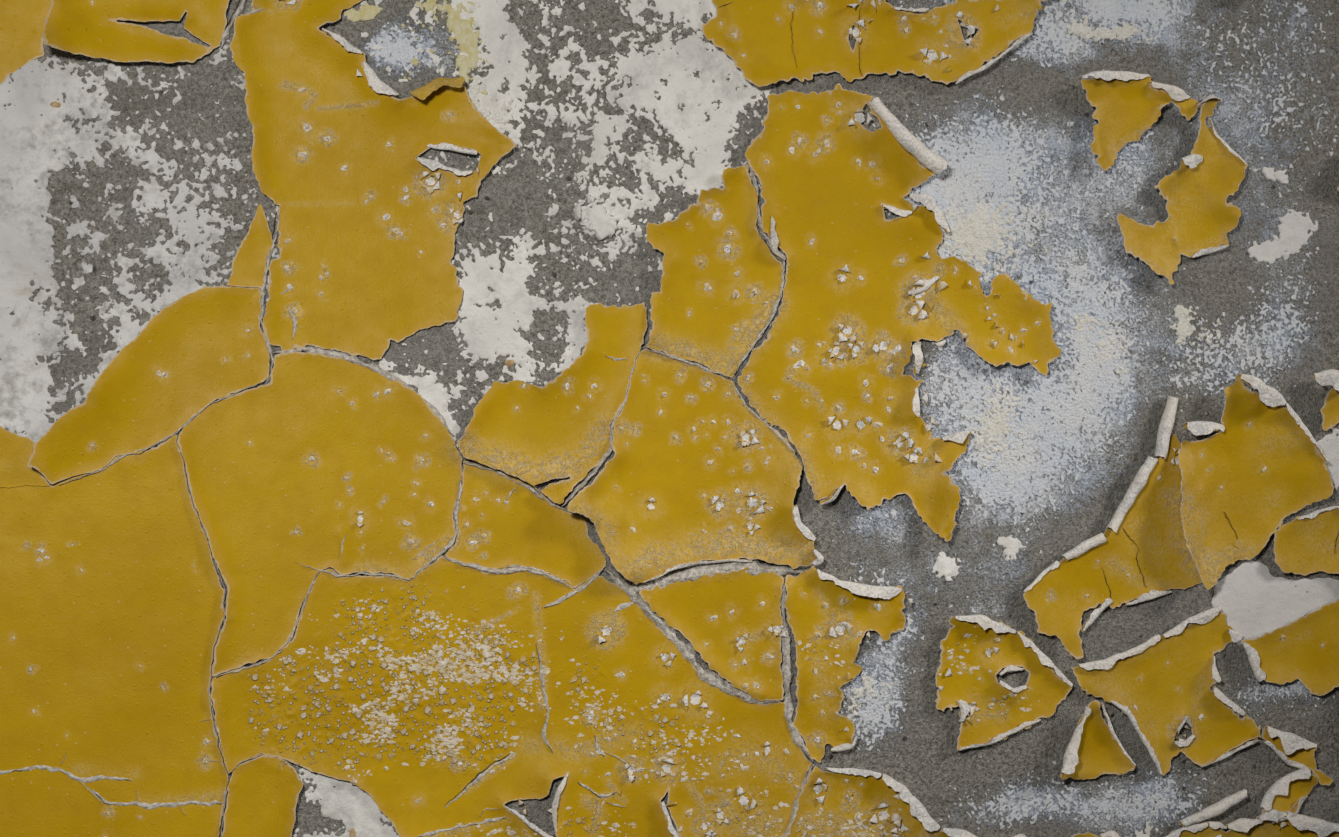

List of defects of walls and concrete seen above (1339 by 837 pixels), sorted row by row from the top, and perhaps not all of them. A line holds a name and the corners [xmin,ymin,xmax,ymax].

crack [0,161,814,837]
peeling [0,0,1062,837]
peeling [935,369,1339,837]
peeling [1081,70,1248,285]